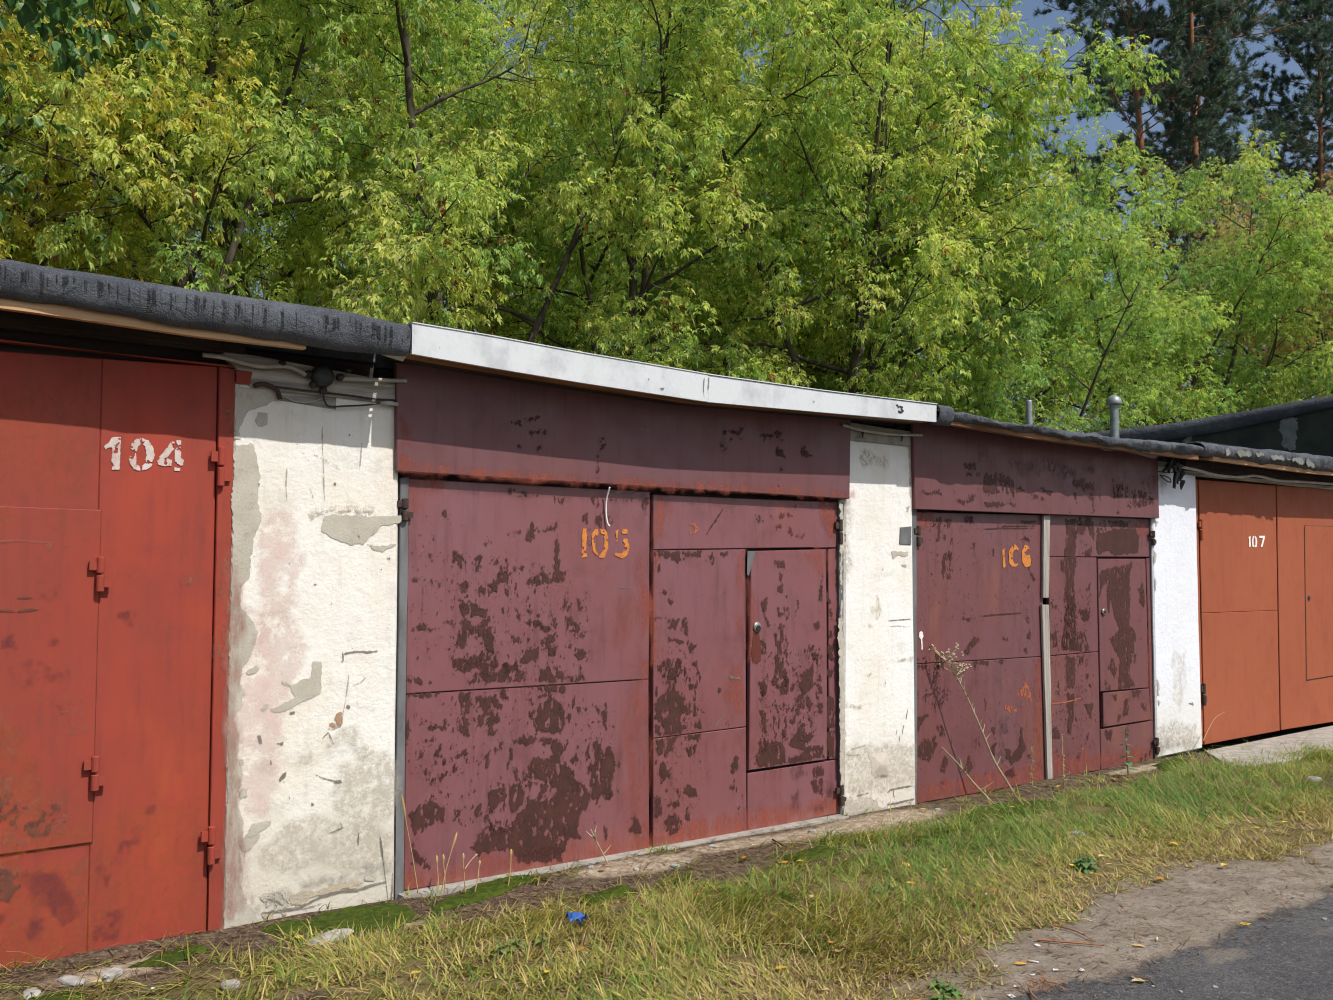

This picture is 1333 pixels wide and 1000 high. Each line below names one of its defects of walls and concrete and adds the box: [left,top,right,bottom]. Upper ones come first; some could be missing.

corrosion [760,430,813,487]
flaking render [321,514,402,570]
corrosion [582,497,649,546]
corrosion [655,550,728,573]
corrosion [917,463,1154,785]
flaking render [223,385,376,929]
corrosion [405,521,621,869]
corrosion [627,589,705,835]
corrosion [729,560,835,814]
corrosion [0,791,65,837]
corrosion [0,869,21,902]